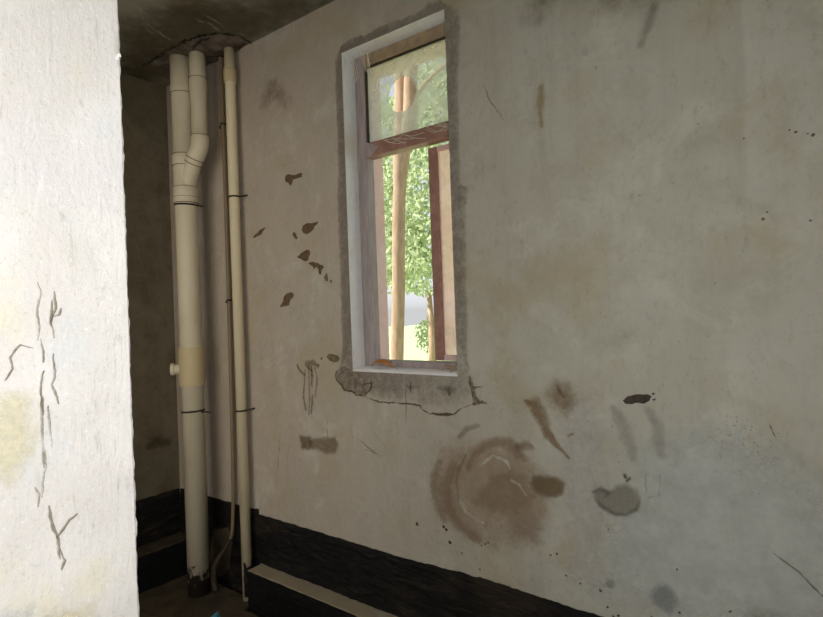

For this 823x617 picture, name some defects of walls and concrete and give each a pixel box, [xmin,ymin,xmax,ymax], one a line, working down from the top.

crack [136,7,252,66]
flaking render [285,173,302,186]
flaking render [293,222,318,239]
flaking render [298,250,332,283]
flaking render [280,292,294,307]
crack [5,294,62,464]
damp [297,360,319,415]
flaking render [623,393,656,404]
damp [525,400,570,459]
damp [532,477,563,496]
crack [35,485,77,570]
crack [774,553,822,596]